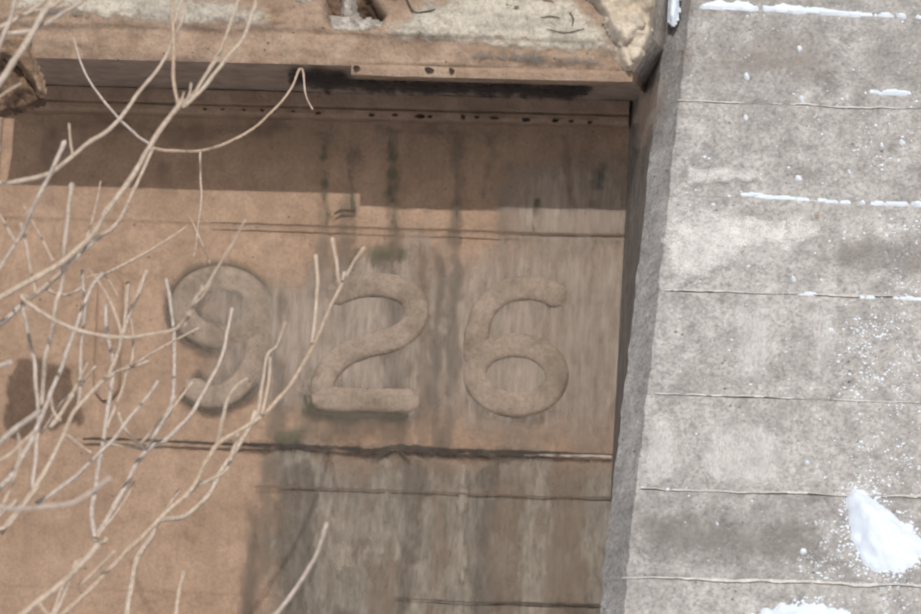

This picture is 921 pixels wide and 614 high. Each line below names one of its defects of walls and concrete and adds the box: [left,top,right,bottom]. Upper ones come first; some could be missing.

peeling [16,0,273,24]
spalling [295,0,383,31]
peeling [390,0,668,85]
spalling [0,28,47,117]
water stain [288,70,593,100]
water stain [207,288,249,327]
water stain [257,162,627,445]
water stain [214,339,250,386]
water stain [243,429,612,614]